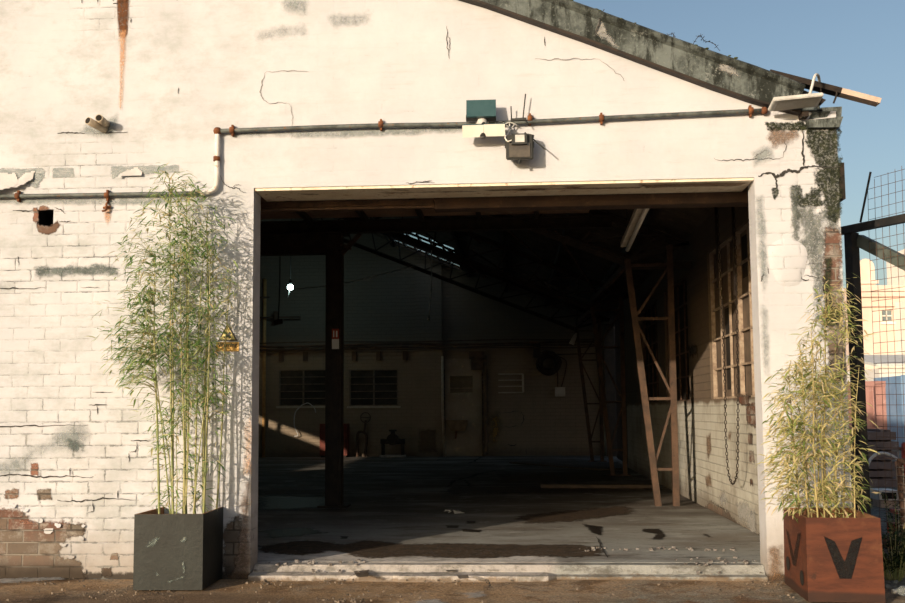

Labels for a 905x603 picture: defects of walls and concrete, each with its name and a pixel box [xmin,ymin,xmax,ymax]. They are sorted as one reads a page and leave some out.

corrosion [117,0,128,78]
crack [536,37,624,79]
crack [260,70,308,132]
peeling [0,168,74,190]
peeling [111,165,179,179]
crack [714,131,840,188]
water stain [756,122,807,161]
spalling [33,205,59,235]
spalling [0,487,87,580]